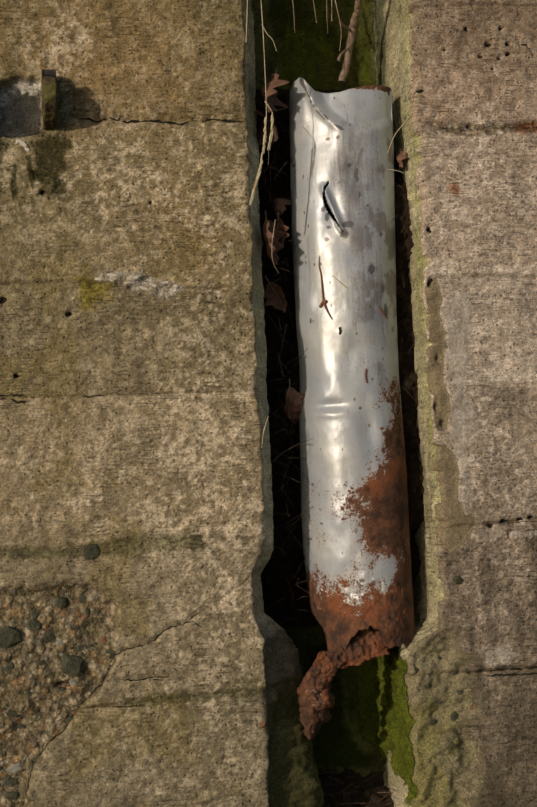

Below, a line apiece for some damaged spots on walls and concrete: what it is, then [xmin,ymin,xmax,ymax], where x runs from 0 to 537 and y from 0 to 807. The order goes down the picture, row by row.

crack [76,116,245,125]
leakage [27,134,71,191]
rust [334,625,390,669]
spalling [0,582,117,807]
crack [22,603,217,807]